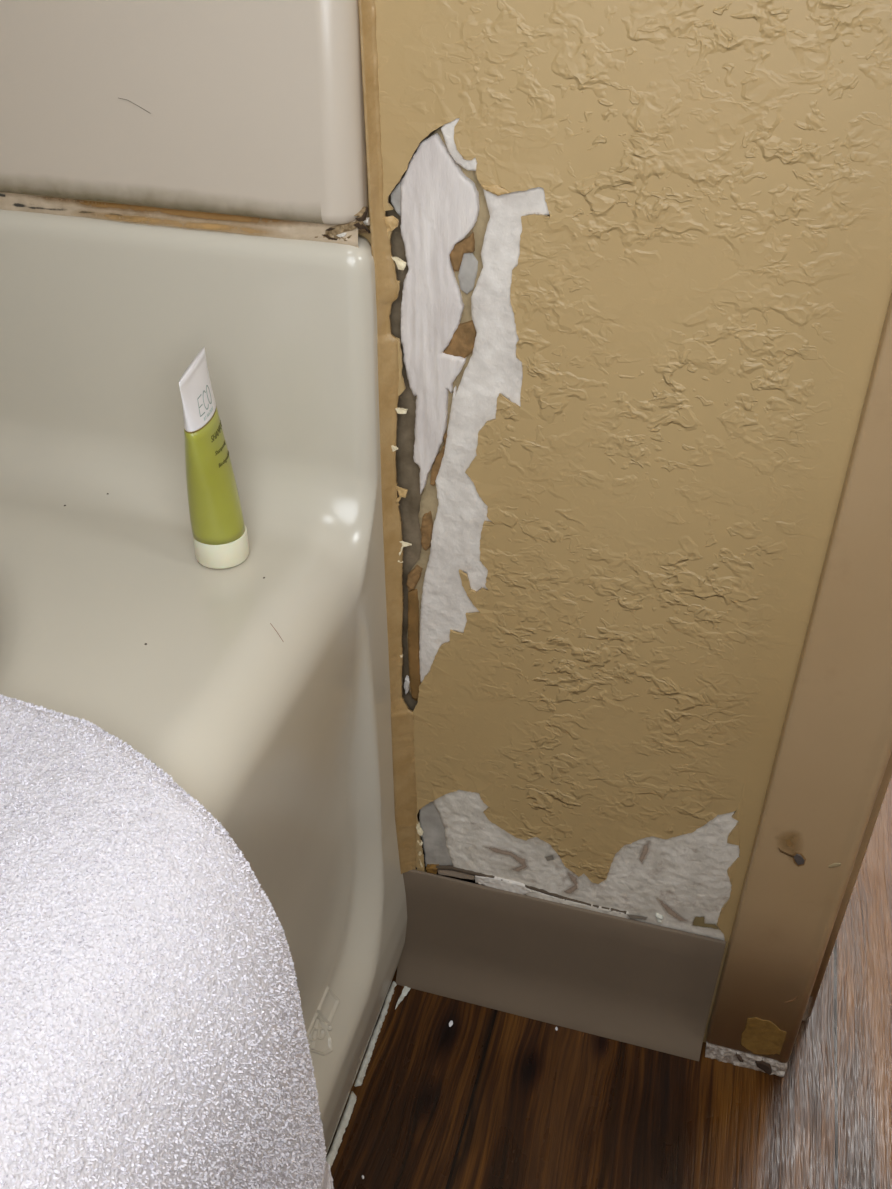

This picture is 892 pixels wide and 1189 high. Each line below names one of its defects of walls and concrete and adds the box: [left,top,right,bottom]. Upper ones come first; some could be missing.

flaking render [383,118,550,711]
flaking render [416,790,740,940]